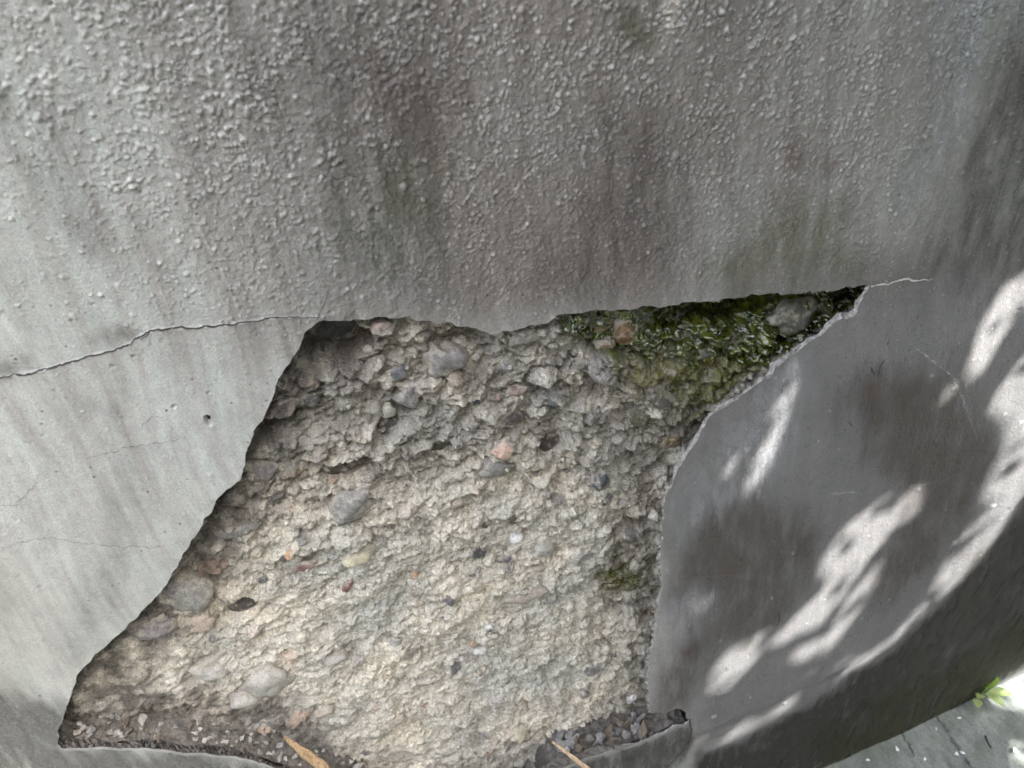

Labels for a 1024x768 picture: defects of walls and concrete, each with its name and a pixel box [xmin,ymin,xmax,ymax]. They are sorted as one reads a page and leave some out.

crack [0,297,327,379]
spalling [57,285,870,768]